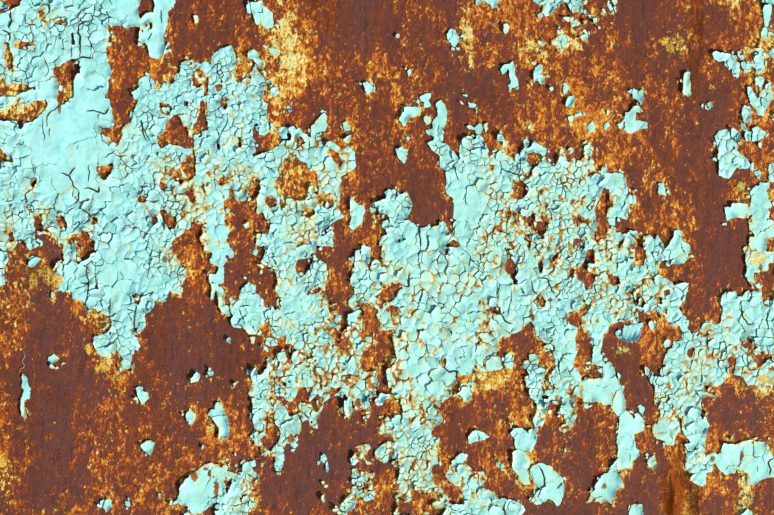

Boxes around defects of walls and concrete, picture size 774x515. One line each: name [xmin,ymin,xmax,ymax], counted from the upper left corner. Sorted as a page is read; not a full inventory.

crack [2,0,112,83]
rust [658,0,704,88]
peeling [712,48,774,179]
crack [5,142,132,233]
rust [27,267,63,290]
crack [67,245,158,348]
peeling [0,0,378,471]
crack [402,218,525,287]
peeling [349,100,774,515]
rust [191,468,219,499]
peeling [173,457,260,515]
rust [663,437,703,515]